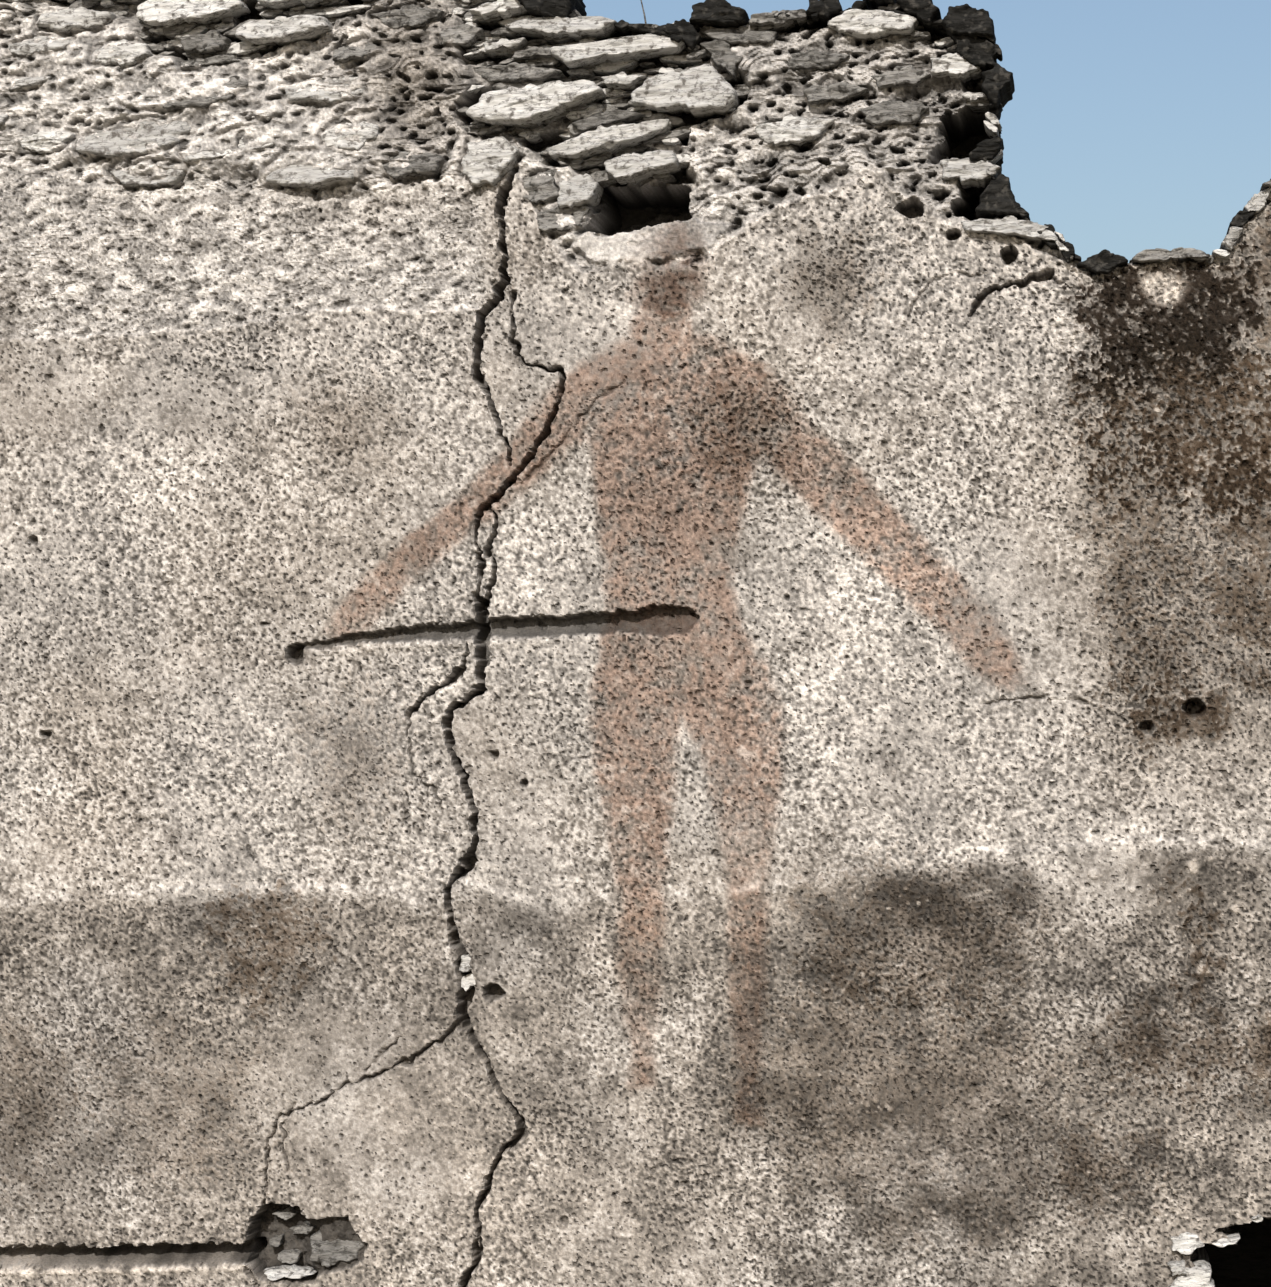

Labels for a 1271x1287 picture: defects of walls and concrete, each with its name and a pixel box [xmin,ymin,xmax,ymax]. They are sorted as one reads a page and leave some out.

spalling [939,111,991,159]
spalling [950,185,988,221]
damp [1064,244,1271,533]
crack [260,164,629,1287]
spalling [243,1201,369,1287]